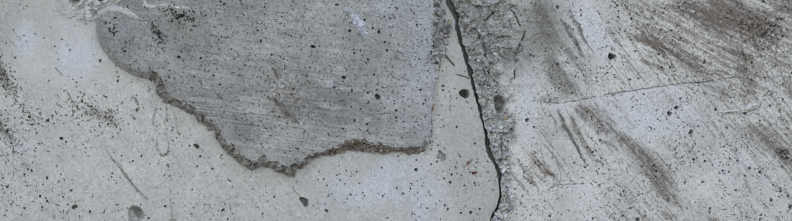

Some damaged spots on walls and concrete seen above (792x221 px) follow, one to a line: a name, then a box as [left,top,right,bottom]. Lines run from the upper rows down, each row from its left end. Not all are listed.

peeling [62,0,525,221]
crack [445,0,526,220]